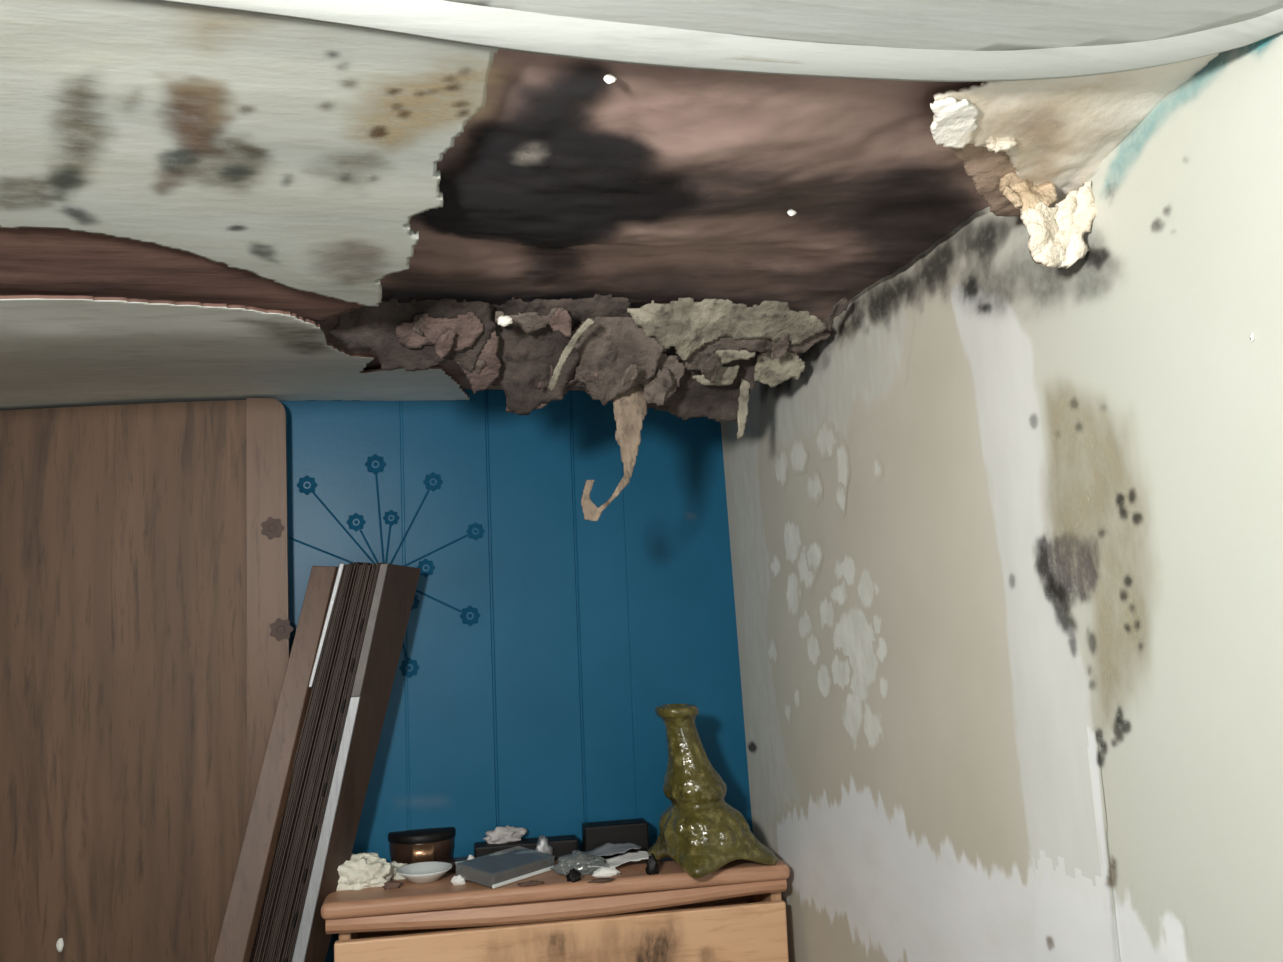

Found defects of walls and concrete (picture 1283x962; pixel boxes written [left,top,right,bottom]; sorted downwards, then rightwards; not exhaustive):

water stain [55,89,101,189]
water stain [371,74,475,144]
water stain [68,209,90,221]
water stain [415,66,1006,361]
spalling [315,49,1219,521]
water stain [1086,250,1107,266]
water stain [762,379,790,395]
water stain [1038,398,1141,690]
water stain [1096,709,1129,765]